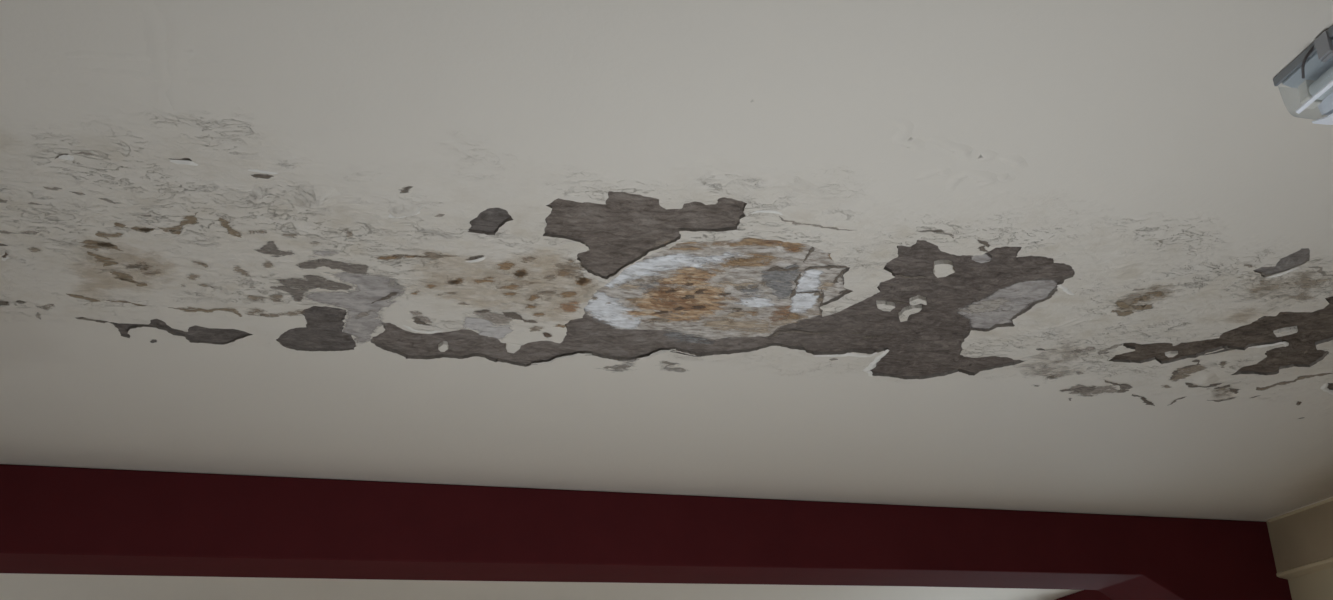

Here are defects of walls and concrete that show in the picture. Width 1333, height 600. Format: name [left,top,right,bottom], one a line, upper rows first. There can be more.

water stain [67,294,146,306]
water stain [81,243,159,286]
spalling [109,319,253,345]
water stain [168,307,242,317]
corrosion [378,252,441,260]
spalling [468,208,513,235]
corrosion [412,238,834,333]
spalling [543,191,747,283]
spalling [248,240,1075,379]
water stain [584,237,850,344]
water stain [1112,287,1166,316]
spalling [1061,296,1333,406]